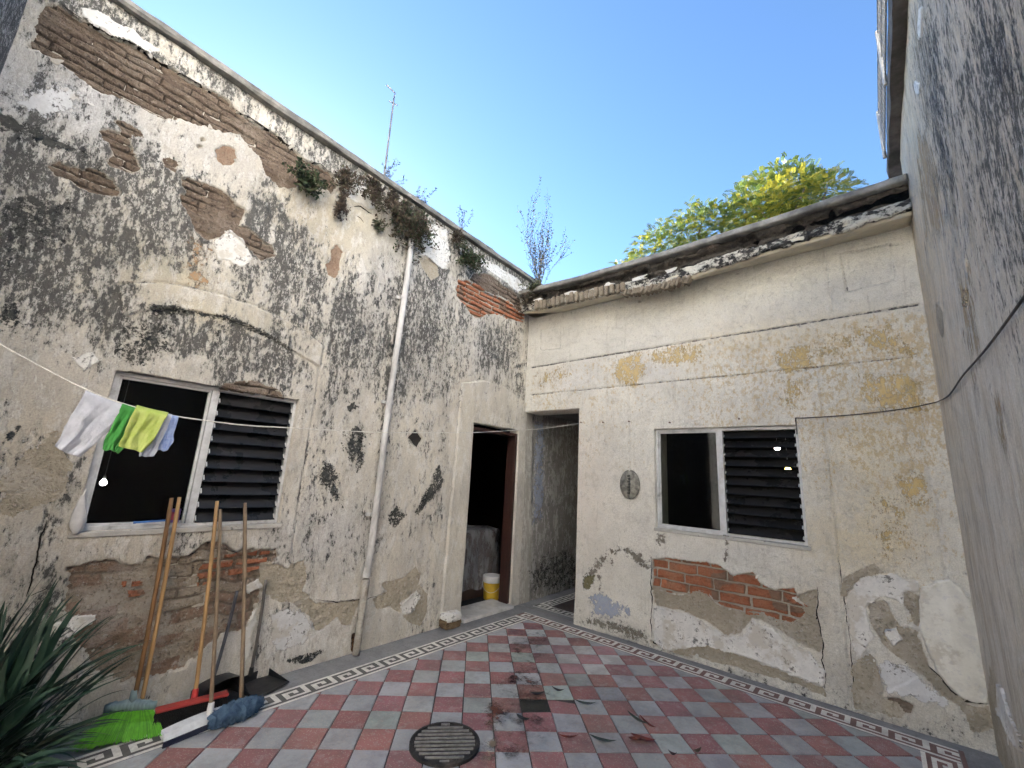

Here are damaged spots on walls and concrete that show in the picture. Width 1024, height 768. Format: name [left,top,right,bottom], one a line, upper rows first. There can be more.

leakage [0,113,103,171]
peeling [16,5,336,196]
leakage [1,186,76,270]
peeling [163,157,277,267]
flaking render [456,260,693,322]
leakage [112,301,281,366]
leakage [317,425,370,508]
leakage [388,465,443,528]
crack [26,520,53,596]
spalling [54,541,359,683]
crack [816,561,854,683]
peeling [840,563,1023,768]